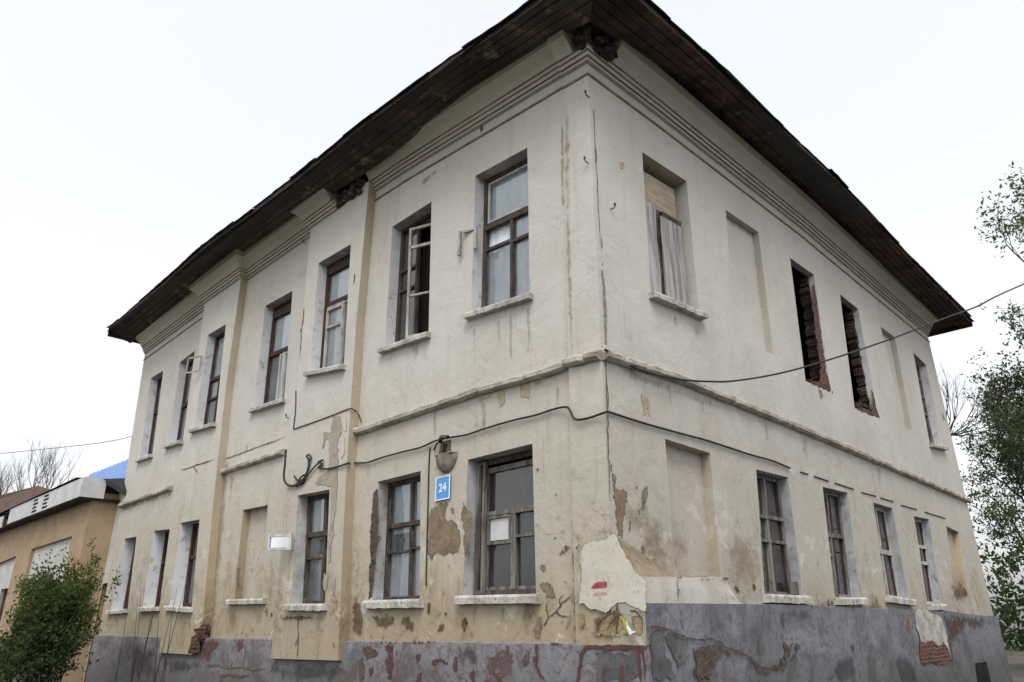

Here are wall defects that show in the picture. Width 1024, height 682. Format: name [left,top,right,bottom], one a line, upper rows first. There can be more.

peeling [316,416,347,596]
spalling [352,489,458,682]
spalling [427,502,473,559]
peeling [578,464,722,682]
crack [533,594,569,681]
spalling [773,641,800,671]
spalling [915,607,951,665]